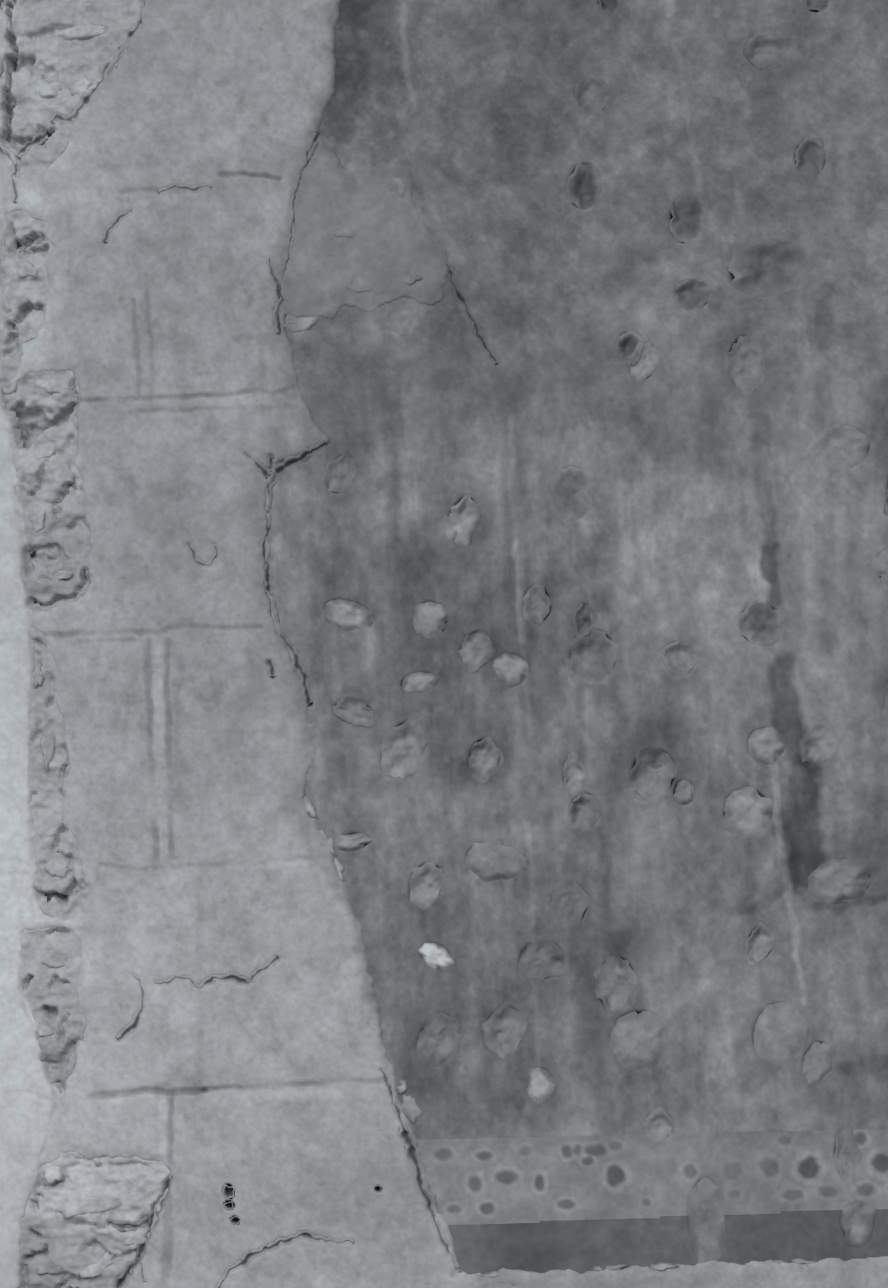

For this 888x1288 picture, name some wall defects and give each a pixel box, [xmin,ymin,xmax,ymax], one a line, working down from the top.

spalling [0,0,141,178]
crack [187,543,220,568]
crack [243,441,326,706]
spalling [0,210,93,1094]
crack [117,956,279,1043]
flaking render [396,1080,424,1125]
spalling [19,1152,170,1288]
crack [215,1231,354,1288]